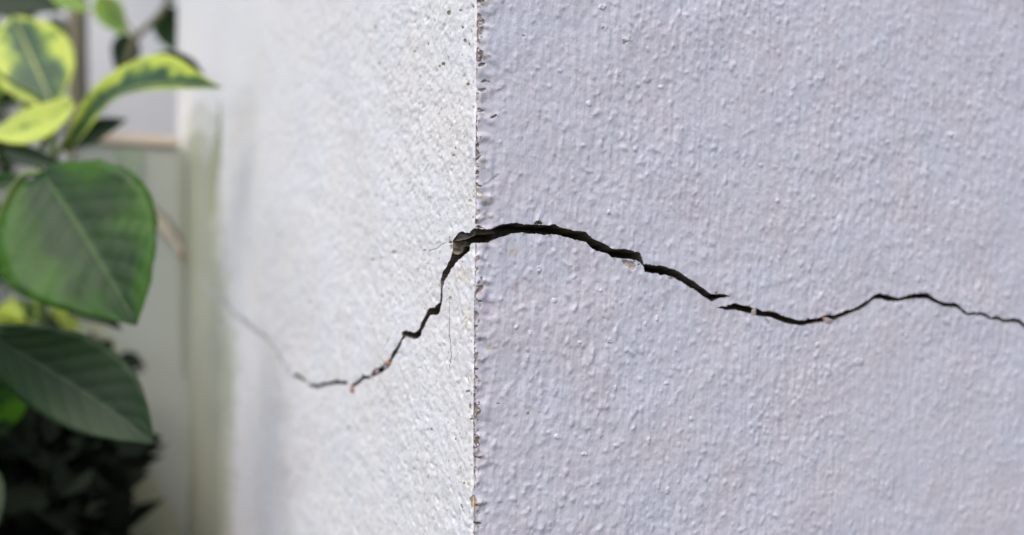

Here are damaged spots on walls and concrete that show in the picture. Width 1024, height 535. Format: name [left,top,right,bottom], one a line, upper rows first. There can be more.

crack [155,210,1024,389]